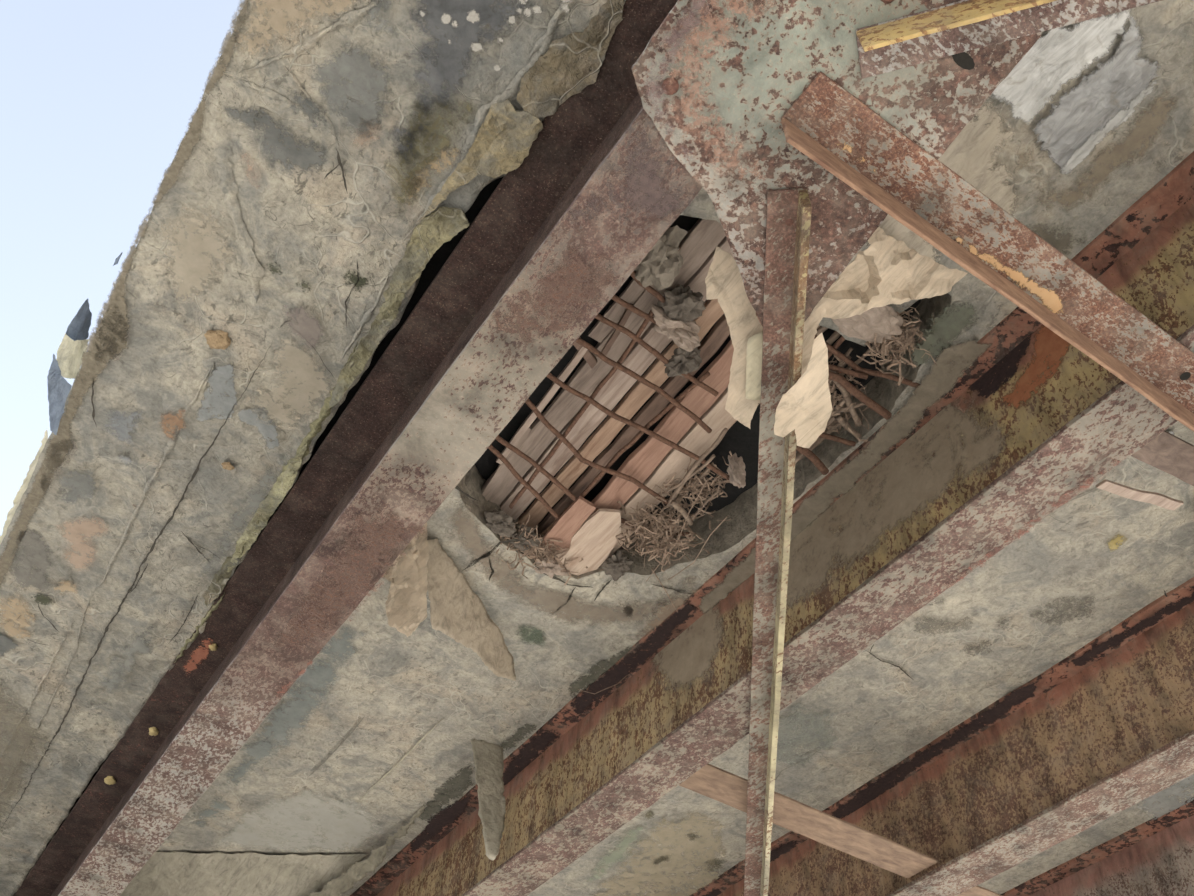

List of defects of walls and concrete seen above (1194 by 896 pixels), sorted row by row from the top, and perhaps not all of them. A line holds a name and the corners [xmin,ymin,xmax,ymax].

leakage [224,0,542,212]
spalling [483,271,746,537]
spalling [814,335,920,420]
rust [968,325,1070,409]
spalling [796,444,829,475]
crack [1,320,337,828]
rust [571,603,695,718]
rust [1071,592,1194,666]
rust [503,731,557,785]
rust [832,680,1039,819]
rust [410,796,472,853]
rust [770,841,800,861]